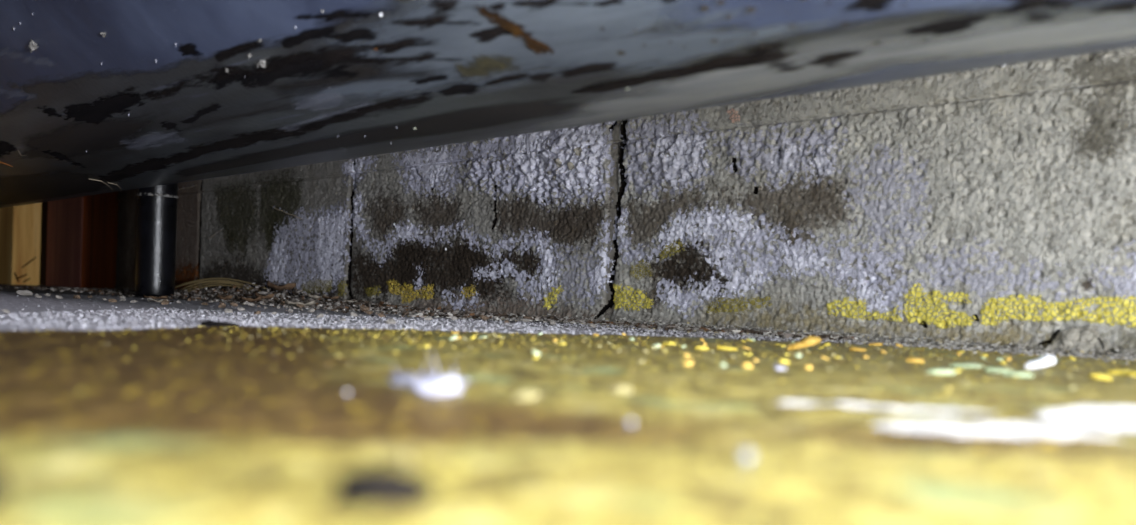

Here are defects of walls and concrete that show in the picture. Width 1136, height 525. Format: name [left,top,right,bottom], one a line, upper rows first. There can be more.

corrosion [476,5,554,54]
crack [594,120,628,319]
leakage [201,111,1136,324]